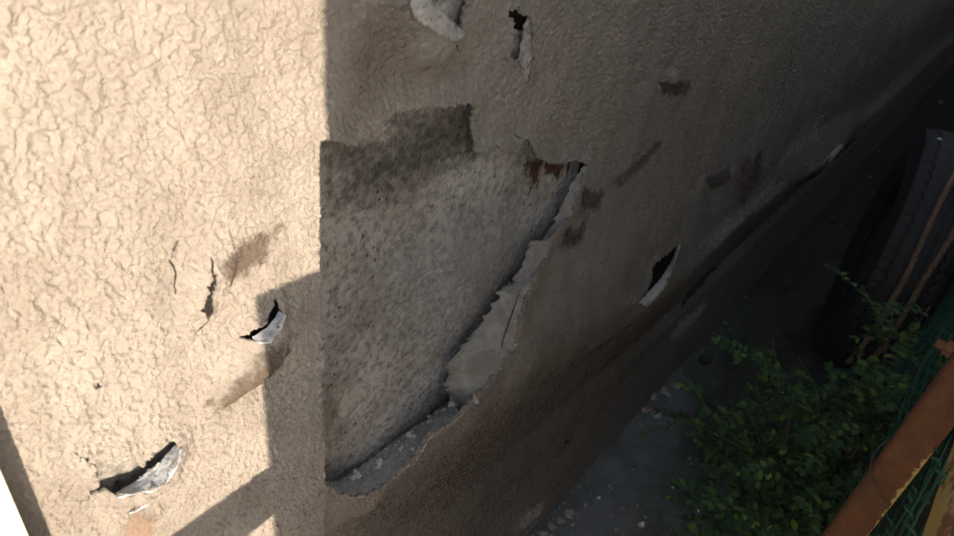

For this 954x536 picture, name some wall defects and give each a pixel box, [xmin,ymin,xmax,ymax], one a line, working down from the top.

peeling [410,0,465,51]
peeling [510,18,532,81]
rust [525,157,570,193]
crack [169,240,179,295]
crack [195,258,217,334]
peeling [252,311,287,344]
peeling [318,103,589,498]
peeling [638,244,681,307]
peeling [75,438,183,514]